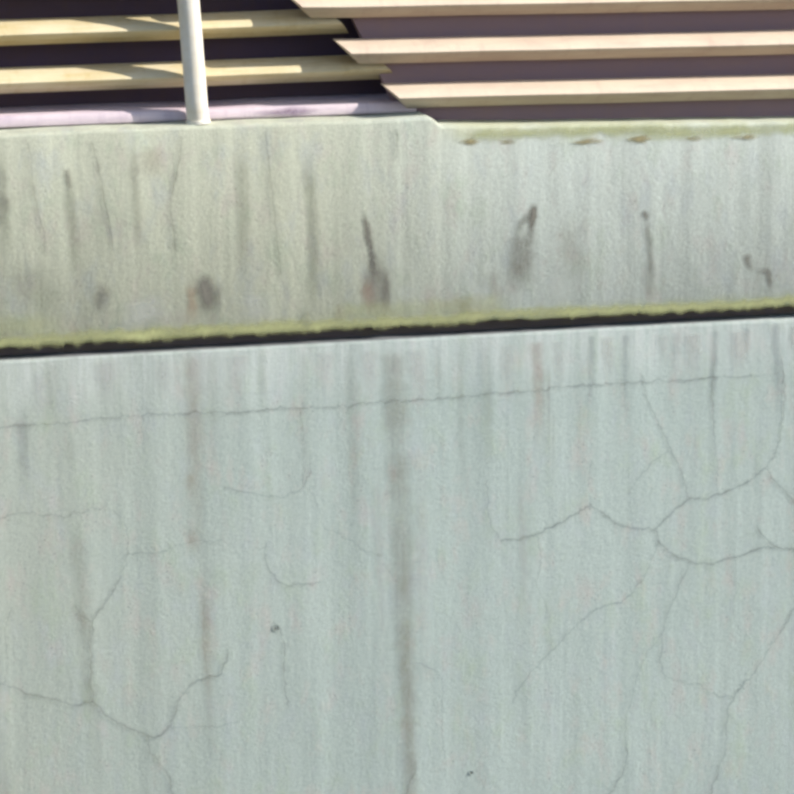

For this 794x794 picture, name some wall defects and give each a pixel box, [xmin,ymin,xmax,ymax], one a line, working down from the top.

damp [364,219,375,268]